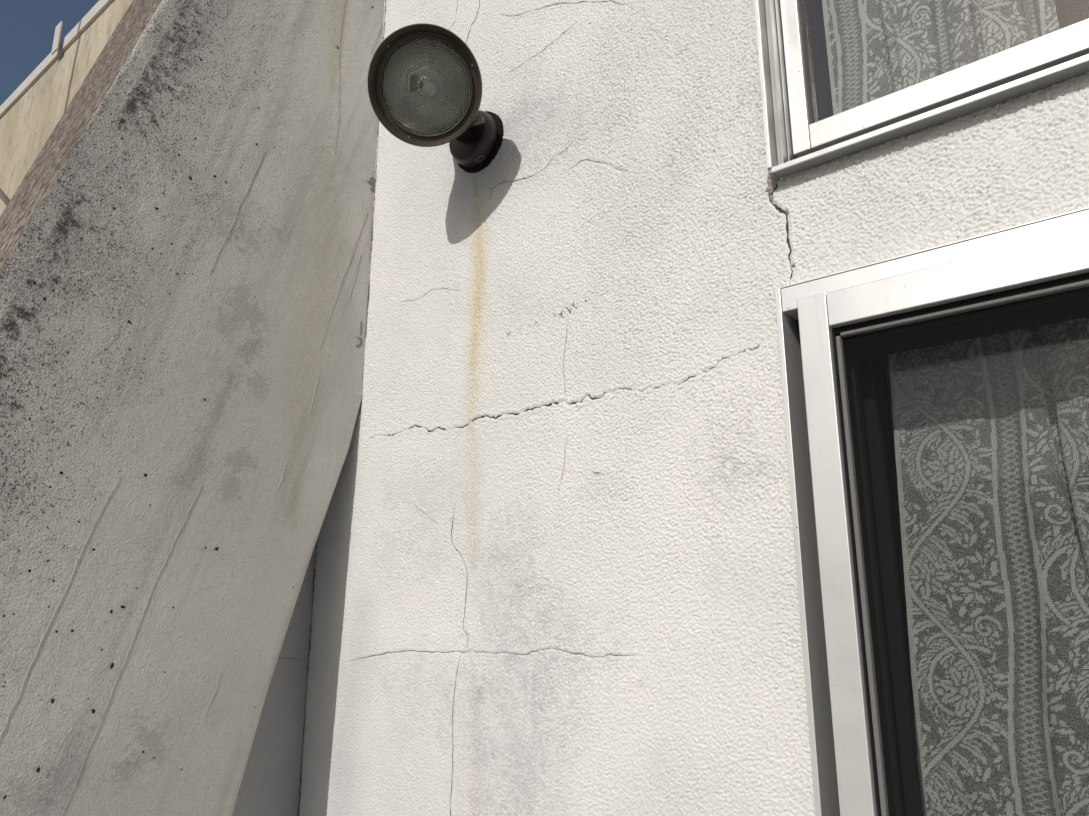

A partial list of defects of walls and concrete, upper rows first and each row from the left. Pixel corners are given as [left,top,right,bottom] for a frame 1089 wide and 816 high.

mould [115,2,208,152]
mould [39,187,96,264]
crack [768,184,793,285]
mould [0,275,68,426]
crack [371,324,763,439]
crack [353,507,633,816]